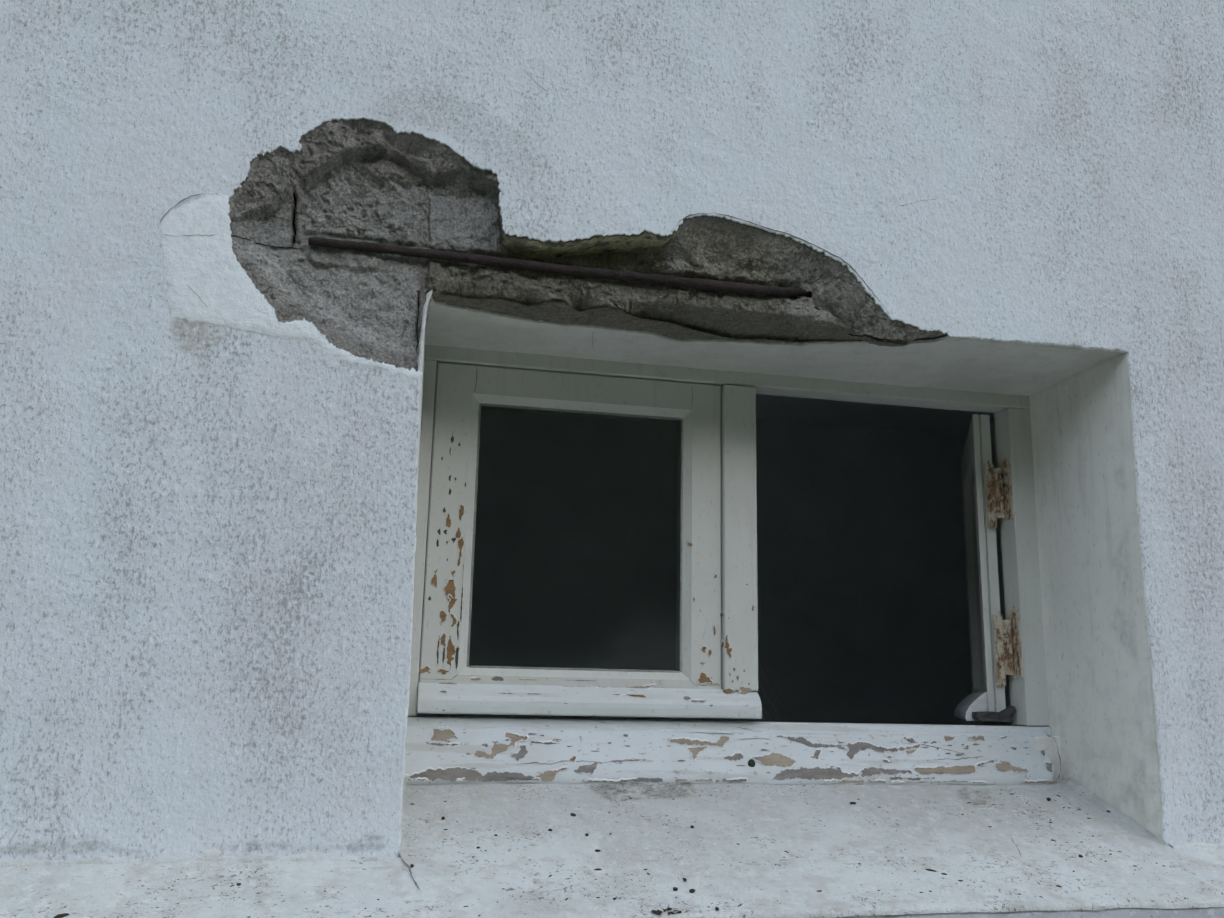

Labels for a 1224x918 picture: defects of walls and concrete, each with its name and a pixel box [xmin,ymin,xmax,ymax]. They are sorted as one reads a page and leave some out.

spalling [159,119,946,384]
peeling [418,475,537,694]
peeling [563,680,656,698]
peeling [684,610,752,707]
peeling [404,726,1057,784]